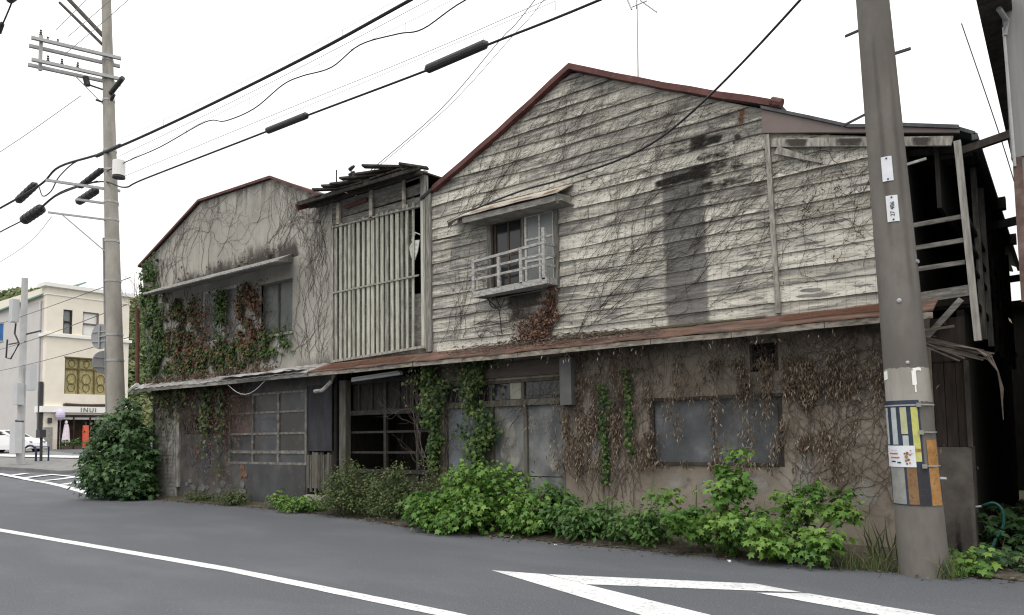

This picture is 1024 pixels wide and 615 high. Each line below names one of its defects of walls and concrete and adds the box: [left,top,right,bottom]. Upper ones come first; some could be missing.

leakage [572,133,766,351]
leakage [804,318,871,334]
rust [319,356,414,369]